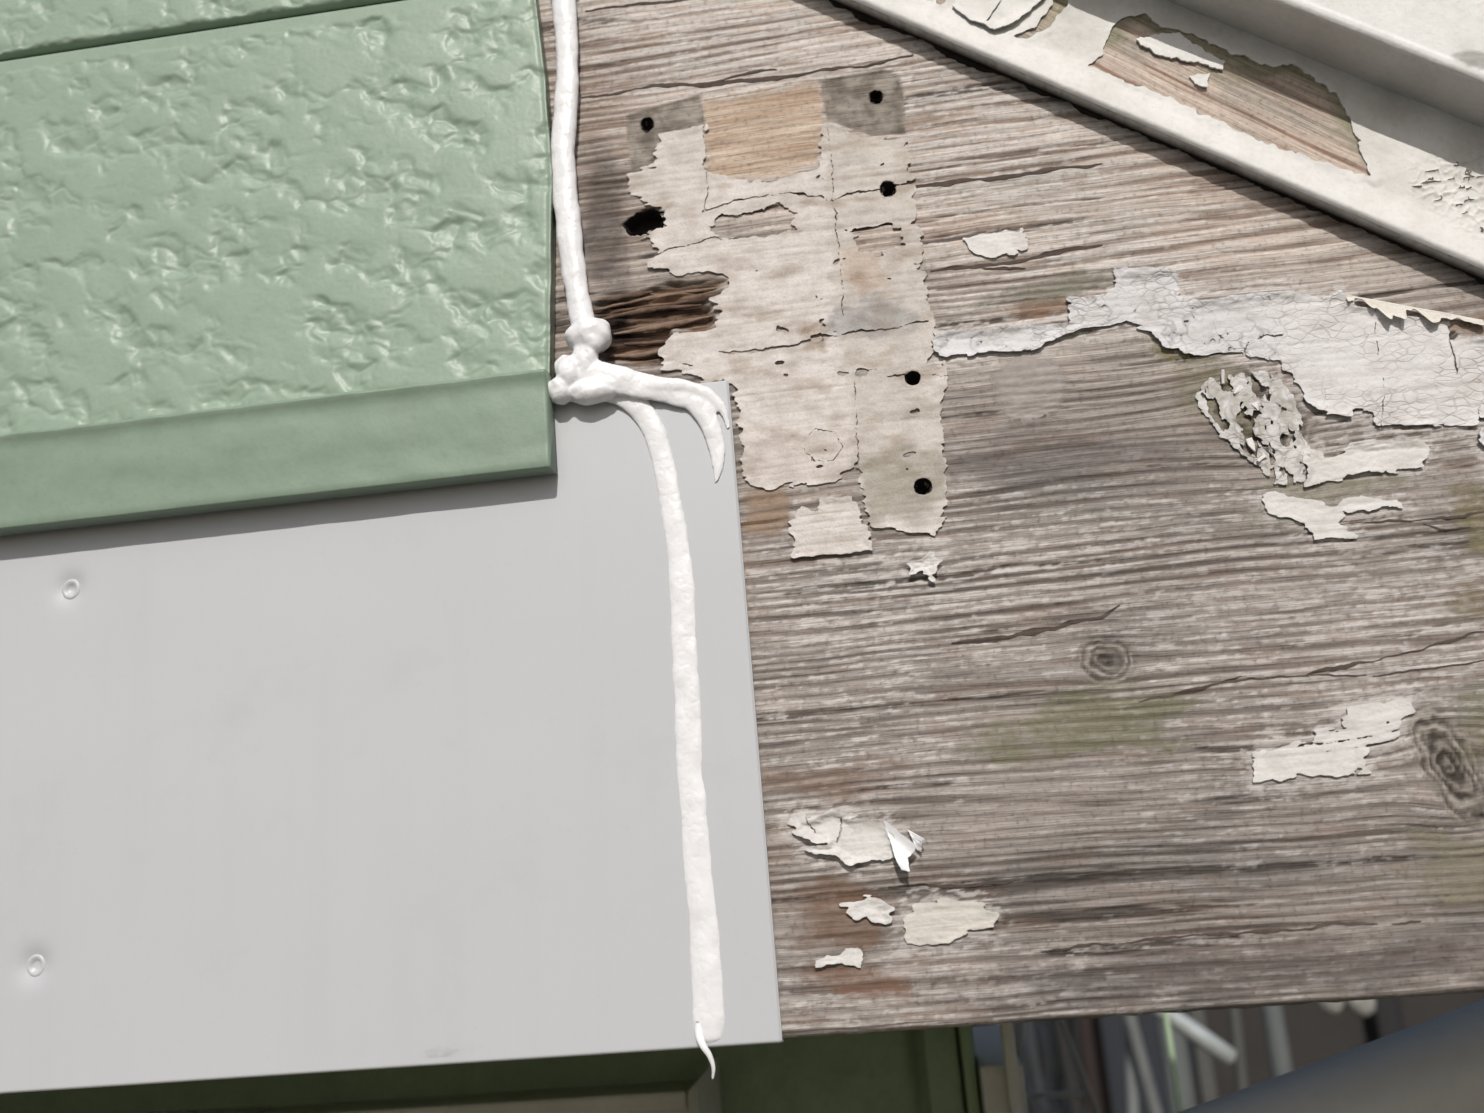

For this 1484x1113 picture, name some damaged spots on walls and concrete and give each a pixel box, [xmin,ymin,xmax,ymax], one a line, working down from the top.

peeling [936,0,1068,39]
peeling [1088,14,1370,176]
crack [1412,161,1484,231]
peeling [626,123,1484,582]
peeling [1252,697,1416,783]
peeling [787,809,924,872]
peeling [839,895,999,946]
peeling [815,948,863,968]